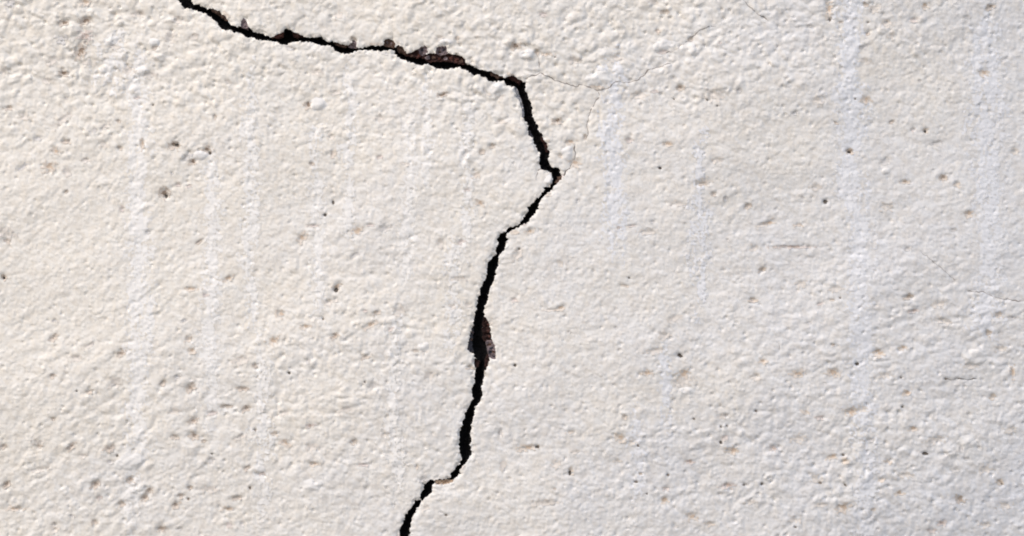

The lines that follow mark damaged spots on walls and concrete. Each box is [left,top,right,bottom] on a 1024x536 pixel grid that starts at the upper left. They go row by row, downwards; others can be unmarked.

crack [178,0,716,536]